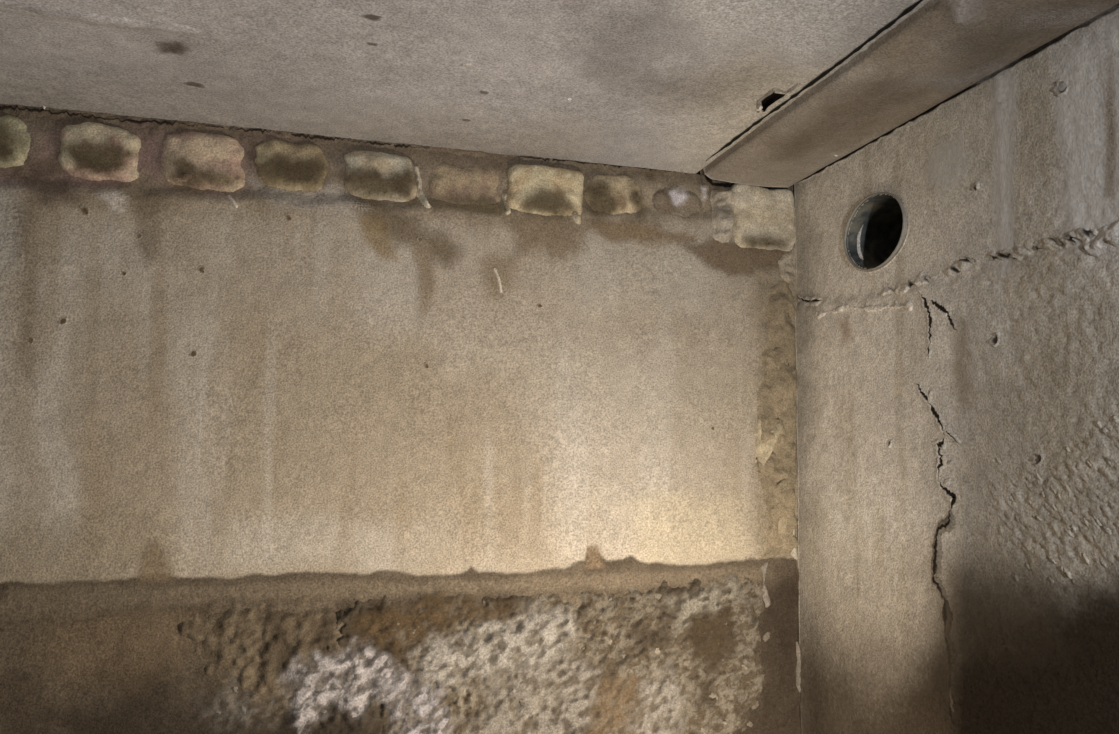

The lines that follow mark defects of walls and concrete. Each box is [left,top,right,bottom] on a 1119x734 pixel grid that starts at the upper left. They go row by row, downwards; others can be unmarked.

water stain [100,191,126,214]
water stain [599,222,791,275]
crack [915,290,961,723]
water stain [0,530,1119,734]